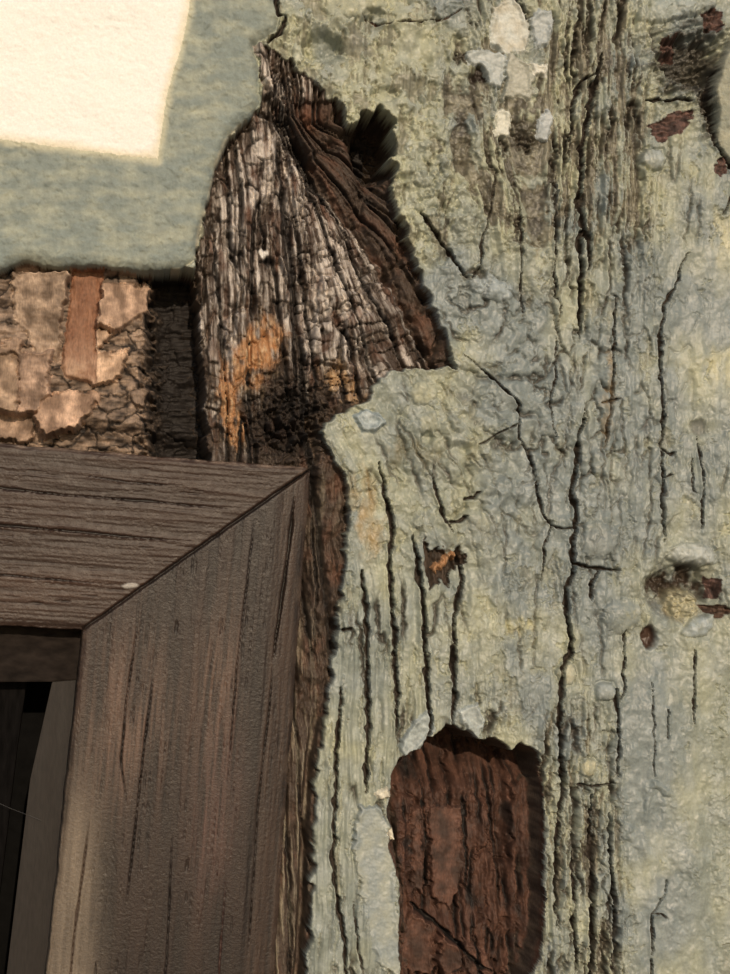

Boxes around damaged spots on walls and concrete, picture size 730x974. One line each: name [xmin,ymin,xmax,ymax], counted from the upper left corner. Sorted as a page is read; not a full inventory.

peeling [647,110,695,144]
crack [643,69,730,170]
crack [420,172,497,279]
peeling [0,268,154,445]
crack [657,252,706,544]
peeling [423,537,468,596]
crack [464,53,628,974]
peeling [697,576,730,619]
crack [329,461,493,974]
peeling [398,710,436,756]
crack [651,648,698,778]
peeling [408,804,465,911]